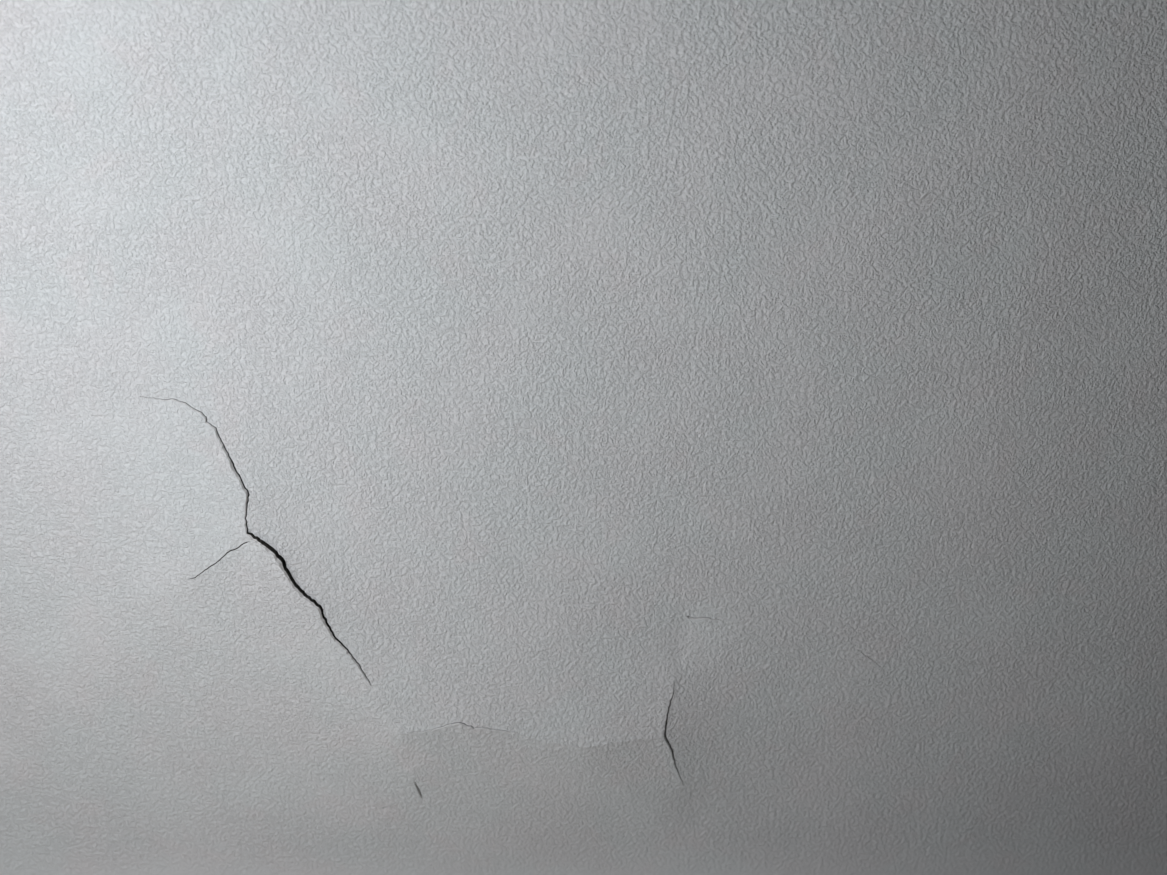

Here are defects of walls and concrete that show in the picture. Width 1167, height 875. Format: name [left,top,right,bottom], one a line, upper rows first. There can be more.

crack [144,397,372,687]
crack [664,685,684,786]